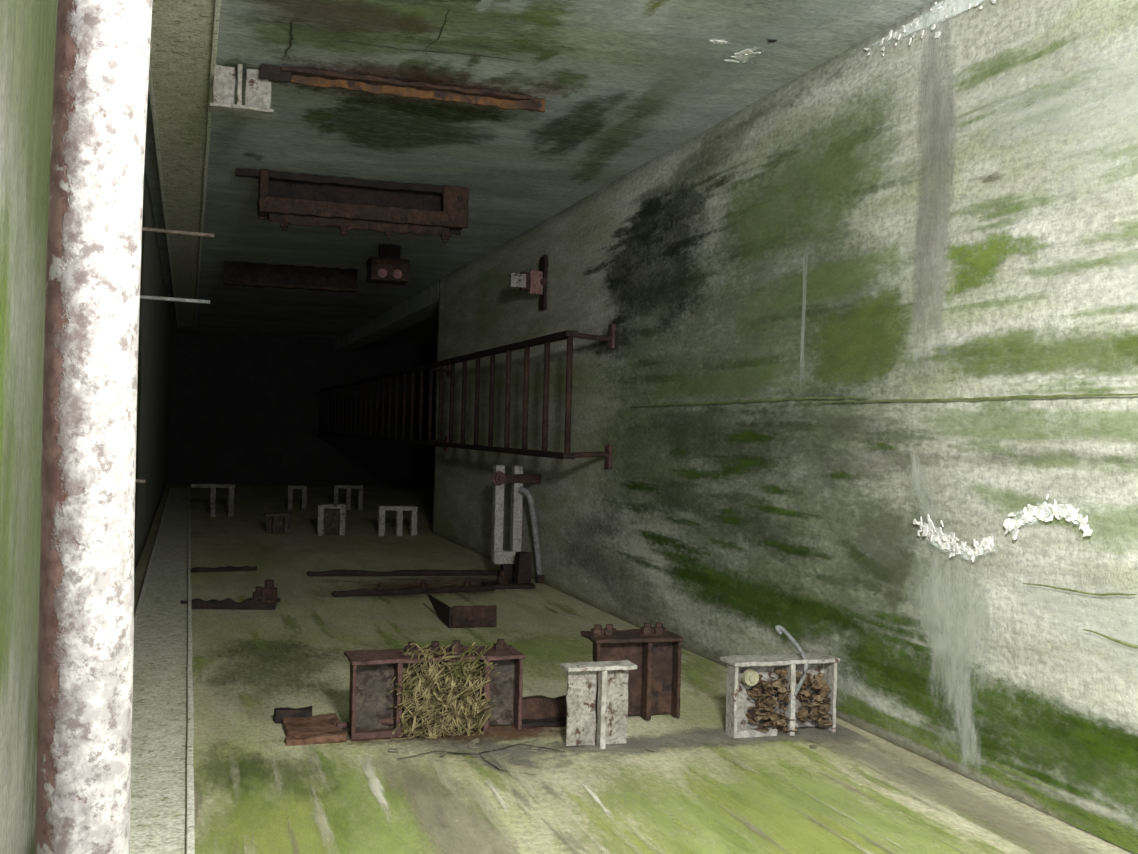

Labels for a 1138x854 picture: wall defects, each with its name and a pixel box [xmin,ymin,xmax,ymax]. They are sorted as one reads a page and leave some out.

water stain [475,0,565,26]
water stain [672,0,860,93]
water stain [357,101,510,121]
water stain [864,0,995,327]
water stain [611,193,711,256]
water stain [858,558,1138,854]
water stain [194,785,202,818]
water stain [364,756,537,854]